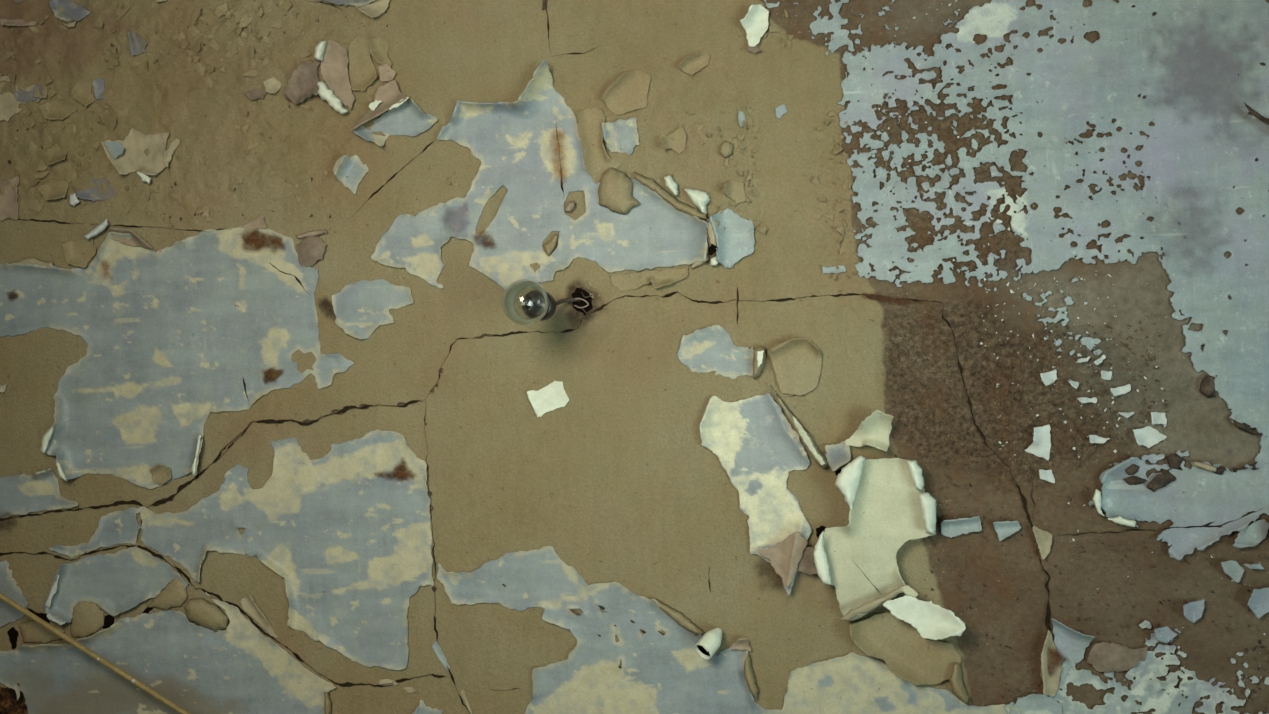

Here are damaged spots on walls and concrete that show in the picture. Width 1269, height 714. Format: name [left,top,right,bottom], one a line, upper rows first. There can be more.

crack [542,0,599,56]
peeling [0,71,43,221]
peeling [69,128,180,206]
peeling [0,207,354,519]
corrosion [243,230,284,250]
peeling [244,40,755,340]
corrosion [554,133,564,177]
peeling [677,324,766,379]
peeling [810,0,1269,597]
corrosion [379,461,414,480]
crack [0,284,1051,714]
peeling [0,381,1269,714]